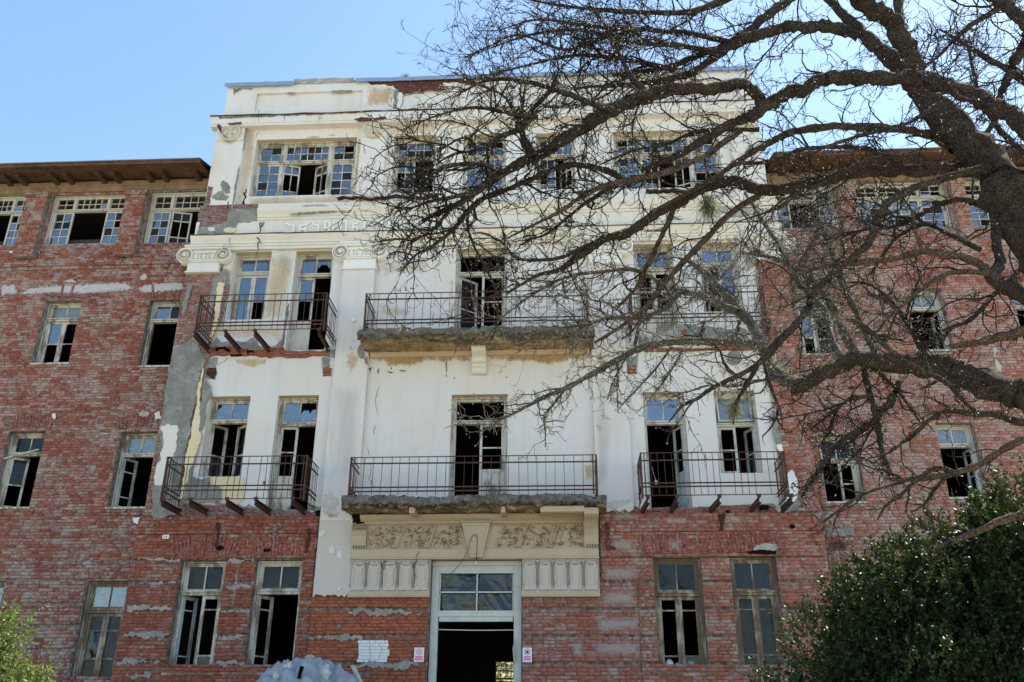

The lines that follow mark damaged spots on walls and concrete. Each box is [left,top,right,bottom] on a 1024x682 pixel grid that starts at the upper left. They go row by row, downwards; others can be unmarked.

spalling [197,166,265,234]